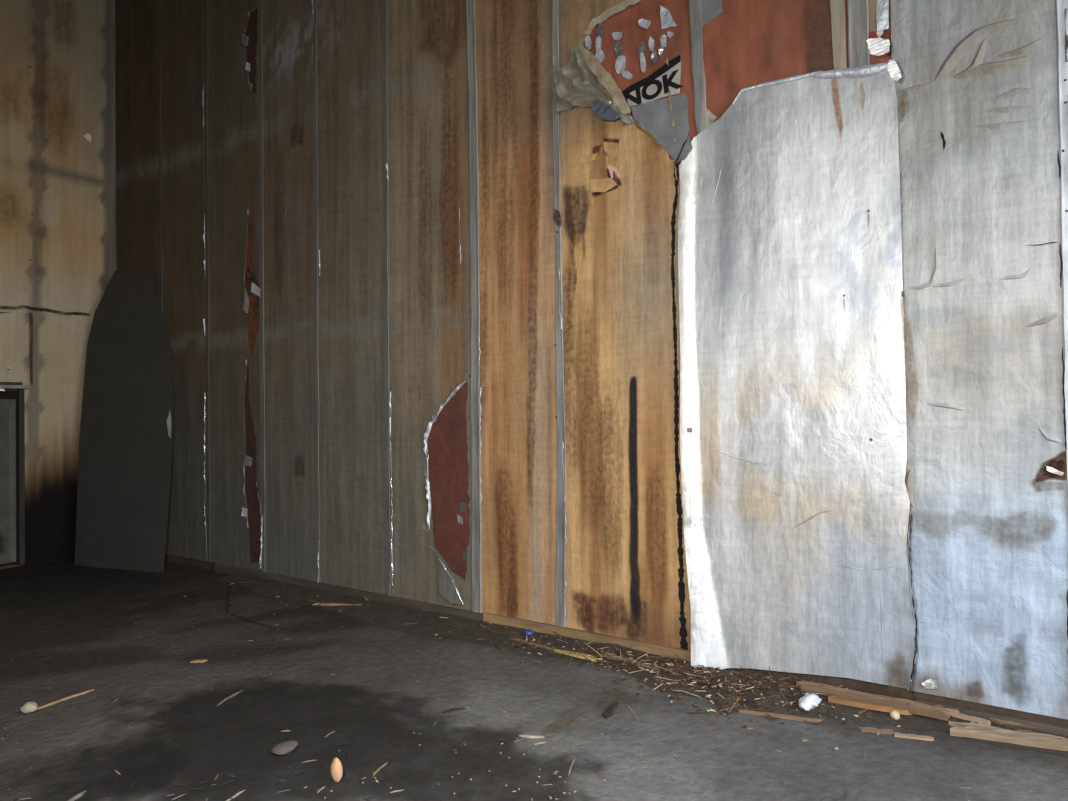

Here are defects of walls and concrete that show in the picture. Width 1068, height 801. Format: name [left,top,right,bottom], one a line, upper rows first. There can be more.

peeling [701,0,723,27]
peeling [807,0,834,73]
peeling [870,0,889,39]
peeling [552,0,690,181]
peeling [242,283,261,313]
corrosion [0,305,89,384]
peeling [423,381,470,605]
leakage [47,683,569,801]